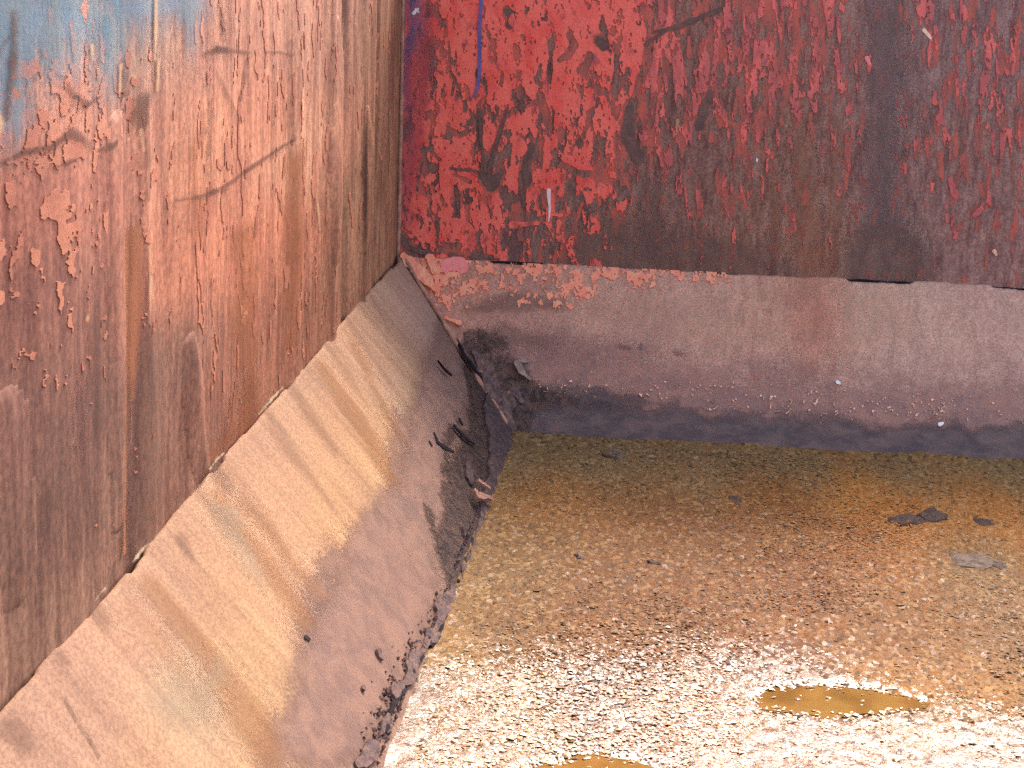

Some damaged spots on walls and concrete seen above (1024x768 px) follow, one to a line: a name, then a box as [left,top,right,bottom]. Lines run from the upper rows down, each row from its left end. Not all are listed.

peeling [12,348,37,370]
peeling [0,0,152,333]
peeling [194,0,381,425]
leakage [257,318,471,768]
peeling [348,0,872,326]
leakage [465,326,1024,460]
peeling [942,177,960,244]
peeling [902,0,1024,182]